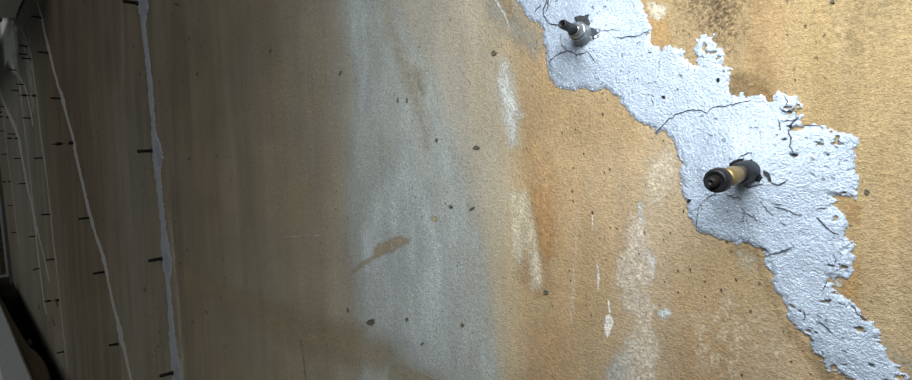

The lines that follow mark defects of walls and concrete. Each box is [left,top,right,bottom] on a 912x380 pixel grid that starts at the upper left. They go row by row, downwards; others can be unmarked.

damp [688,0,738,38]
damp [729,73,774,102]
crack [516,0,911,380]